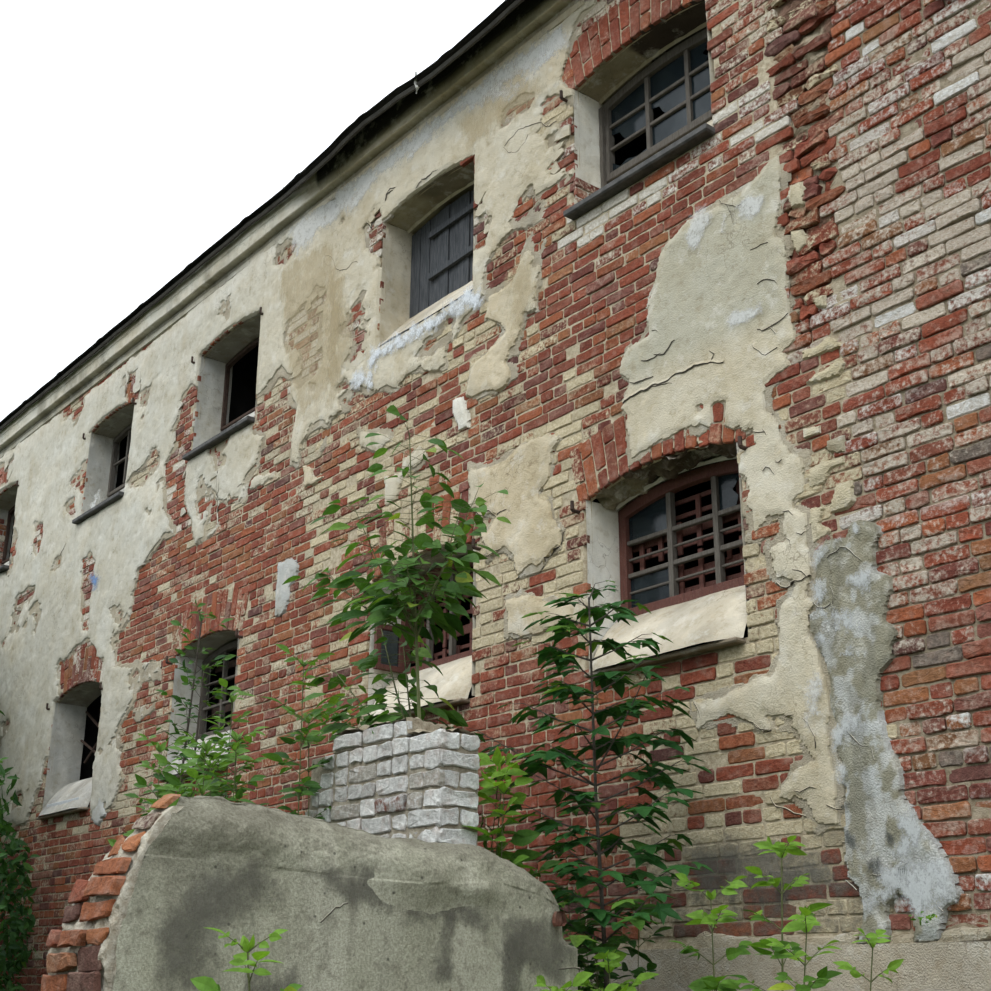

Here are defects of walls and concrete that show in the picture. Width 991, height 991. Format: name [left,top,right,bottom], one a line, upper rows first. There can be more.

flaking render [558,0,846,335]
flaking render [46,334,162,433]
leakage [350,288,481,389]
flaking render [453,397,479,431]
crack [622,329,724,404]
crack [752,313,788,355]
crack [776,510,834,608]
flaking render [54,556,103,703]
crack [750,714,816,748]
flaking render [477,750,600,942]
crack [770,786,842,817]
leakage [885,813,920,855]